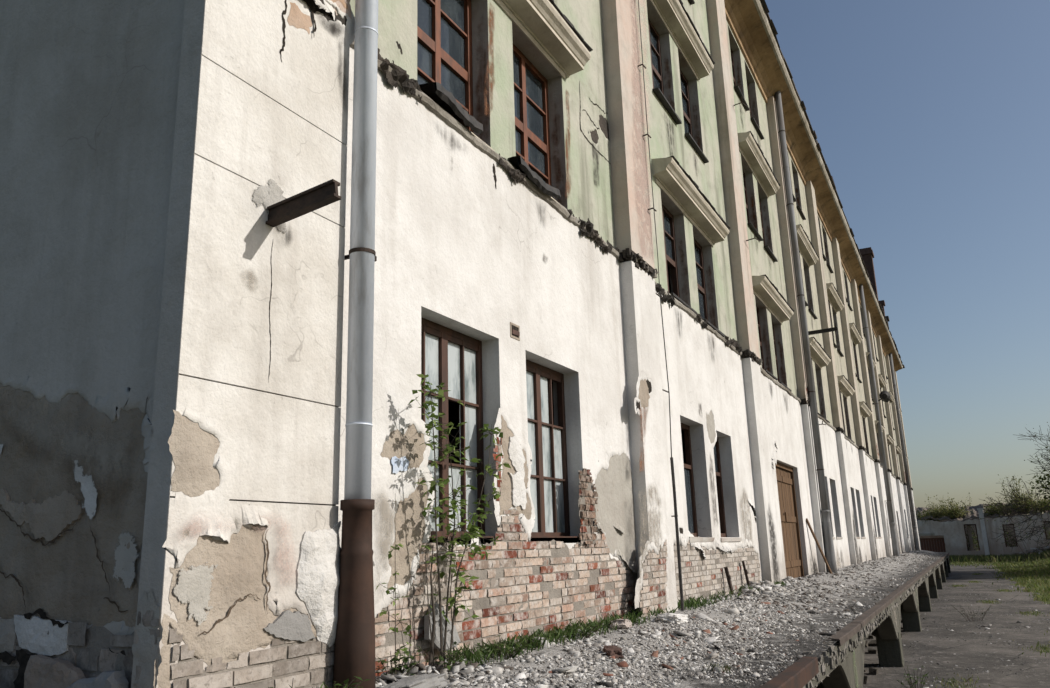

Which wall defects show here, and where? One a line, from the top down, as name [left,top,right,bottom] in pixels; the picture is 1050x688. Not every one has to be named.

flaking render [0,369,335,688]